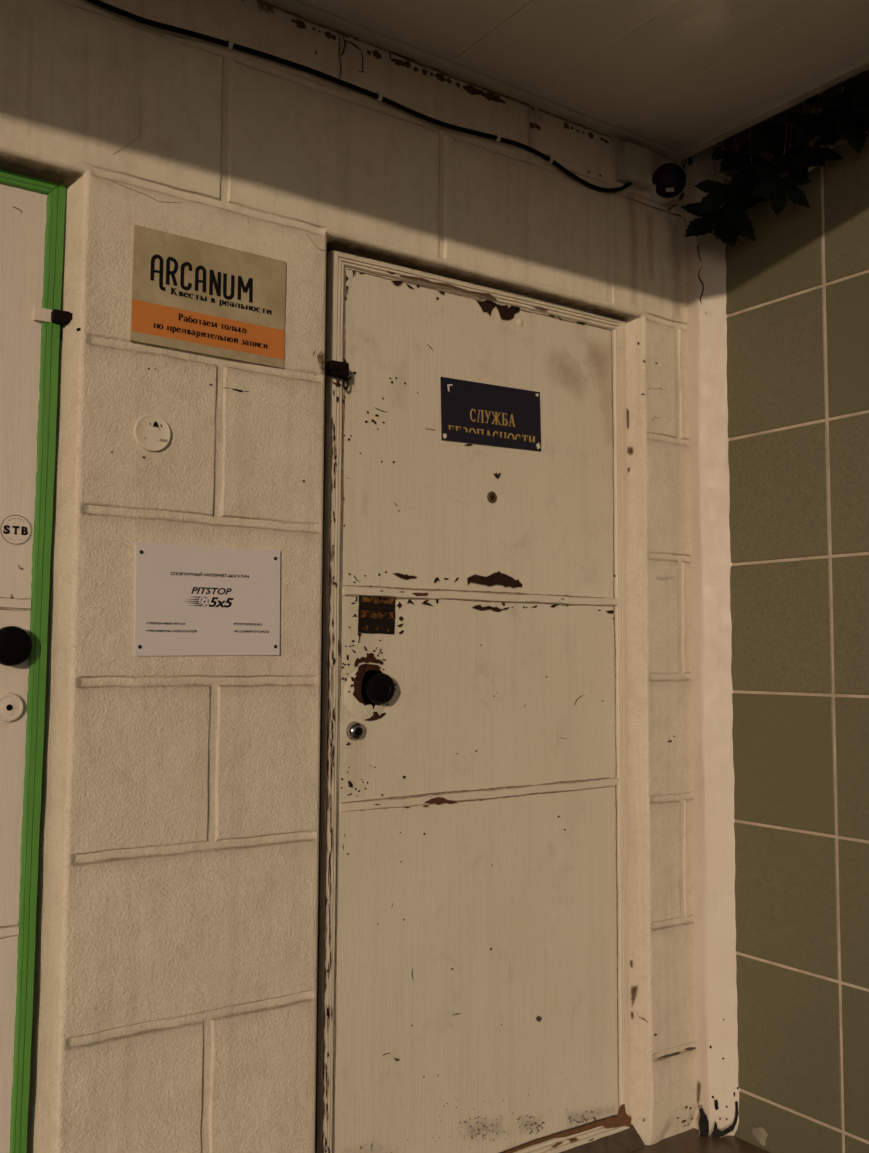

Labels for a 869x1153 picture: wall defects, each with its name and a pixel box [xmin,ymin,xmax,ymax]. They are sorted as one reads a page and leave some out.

peeling [387,271,560,321]
peeling [348,570,523,635]
peeling [472,598,568,612]
rust [313,268,648,1153]
peeling [321,417,386,1153]
peeling [404,797,458,808]